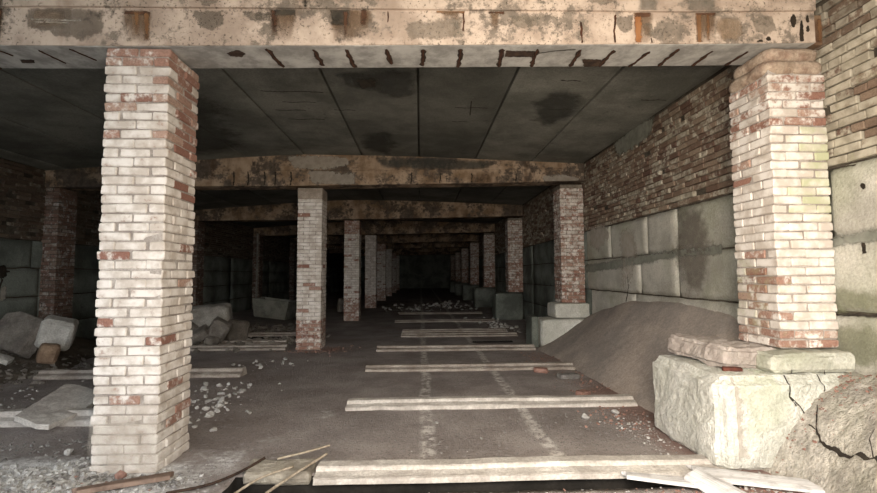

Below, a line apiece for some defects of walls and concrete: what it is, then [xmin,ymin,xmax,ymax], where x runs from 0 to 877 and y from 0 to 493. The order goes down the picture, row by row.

corrosion [124,11,150,39]
corrosion [271,9,295,31]
corrosion [634,12,651,42]
corrosion [696,13,741,42]
damp [535,92,579,124]
crack [783,370,877,462]